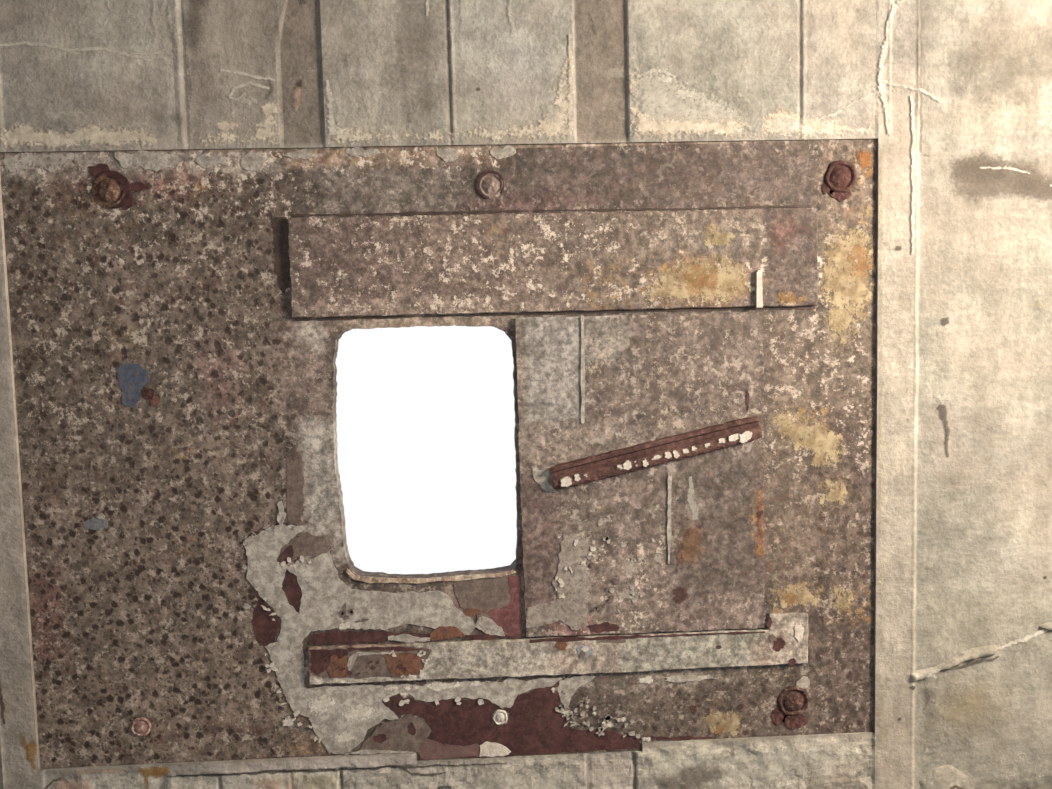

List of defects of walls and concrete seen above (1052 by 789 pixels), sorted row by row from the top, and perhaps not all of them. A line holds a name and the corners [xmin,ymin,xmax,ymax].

rust [88,163,110,177]
water stain [955,156,1052,201]
peeling [242,459,804,760]
peeling [796,676,810,689]
rust [772,707,808,729]